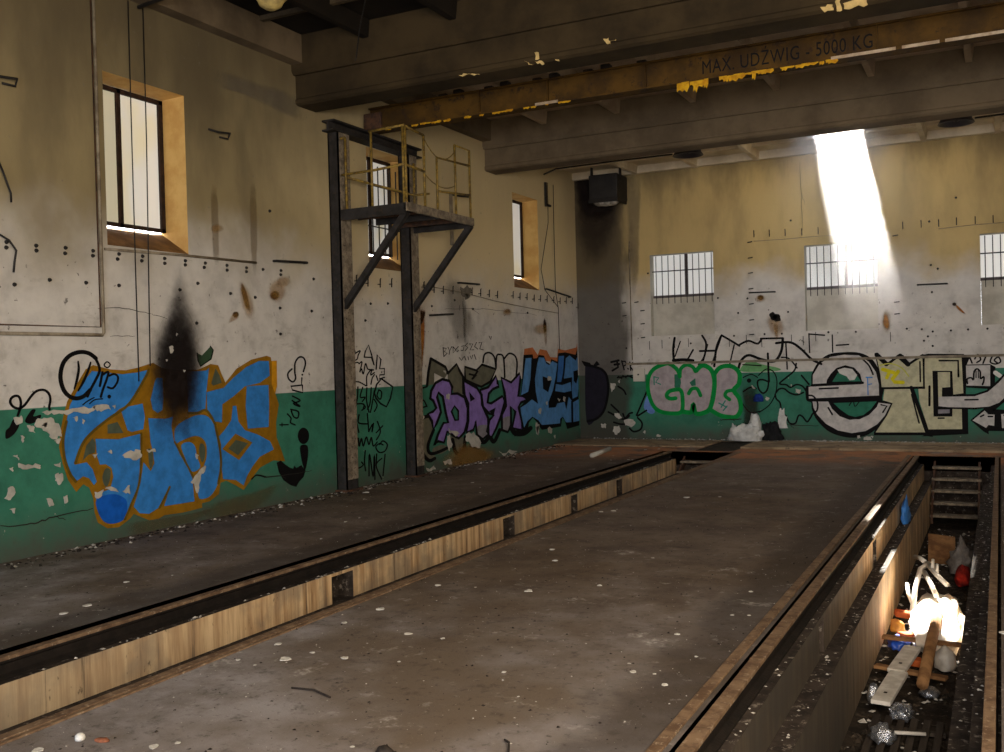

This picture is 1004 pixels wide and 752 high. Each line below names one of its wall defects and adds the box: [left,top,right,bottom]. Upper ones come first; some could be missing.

peeling [820,0,868,12]
peeling [677,59,838,93]
peeling [464,100,571,119]
corrosion [233,285,250,318]
peeling [13,404,116,444]
peeling [601,413,661,437]
peeling [93,448,156,460]
peeling [426,428,481,471]
spalling [0,451,732,735]